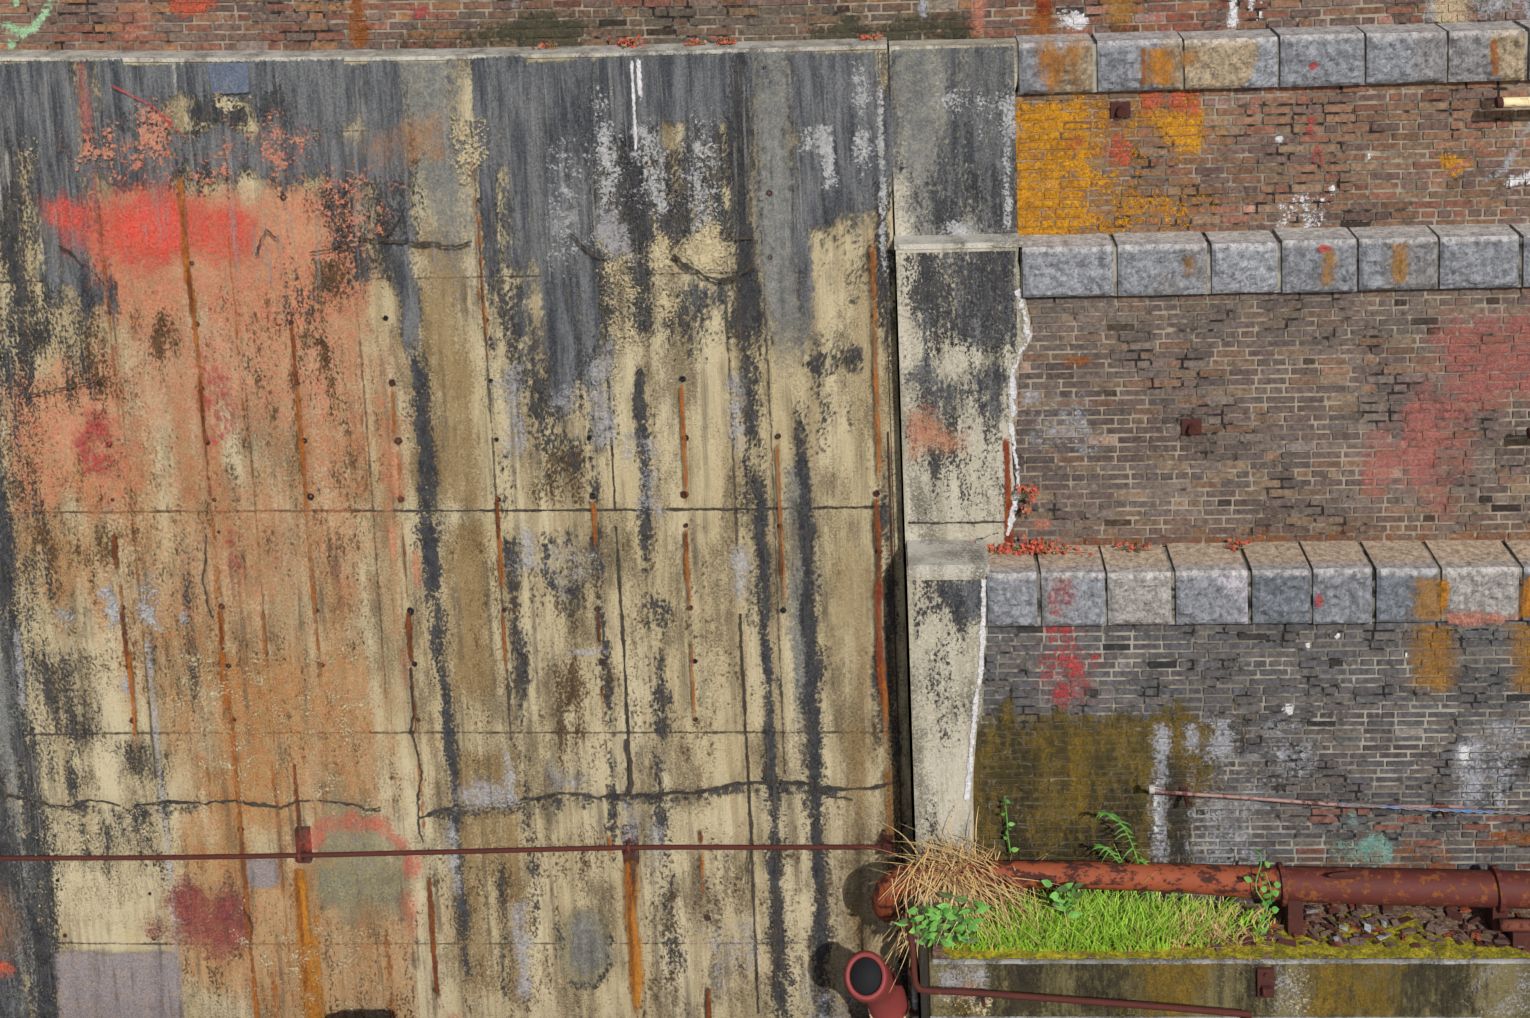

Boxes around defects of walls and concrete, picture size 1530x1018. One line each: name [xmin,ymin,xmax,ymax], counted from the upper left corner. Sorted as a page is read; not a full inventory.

peeling [57,97,180,175]
peeling [222,108,406,272]
damp [0,14,1099,1018]
rust [212,518,325,1018]
crack [0,668,894,843]
damp [974,717,1266,864]
damp [1264,719,1316,781]
damp [1448,722,1526,810]
rust [385,930,396,1018]
rust [607,837,644,1011]
crack [745,850,753,885]